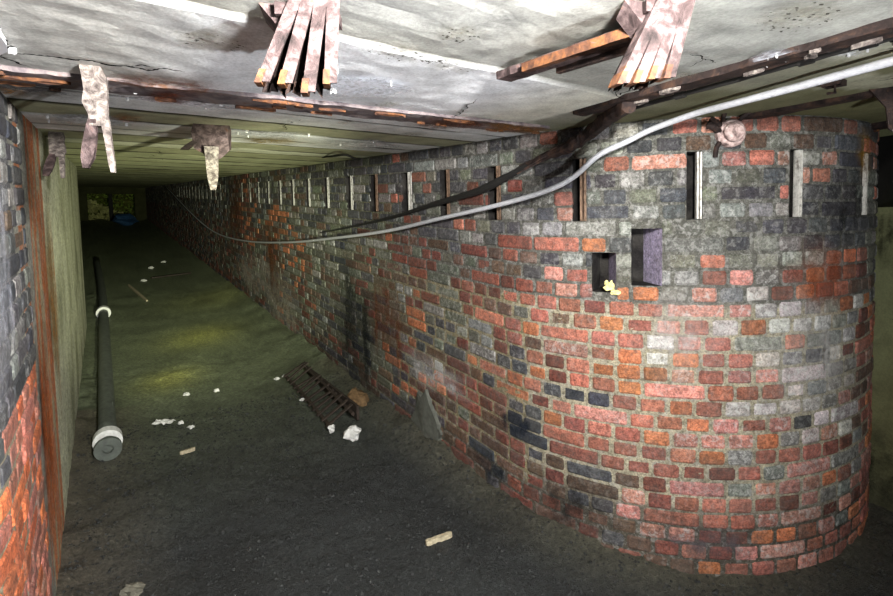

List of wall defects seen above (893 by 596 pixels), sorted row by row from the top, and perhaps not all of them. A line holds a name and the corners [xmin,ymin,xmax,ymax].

peeling [0,28,17,55]
corrosion [235,99,346,116]
corrosion [417,119,540,134]